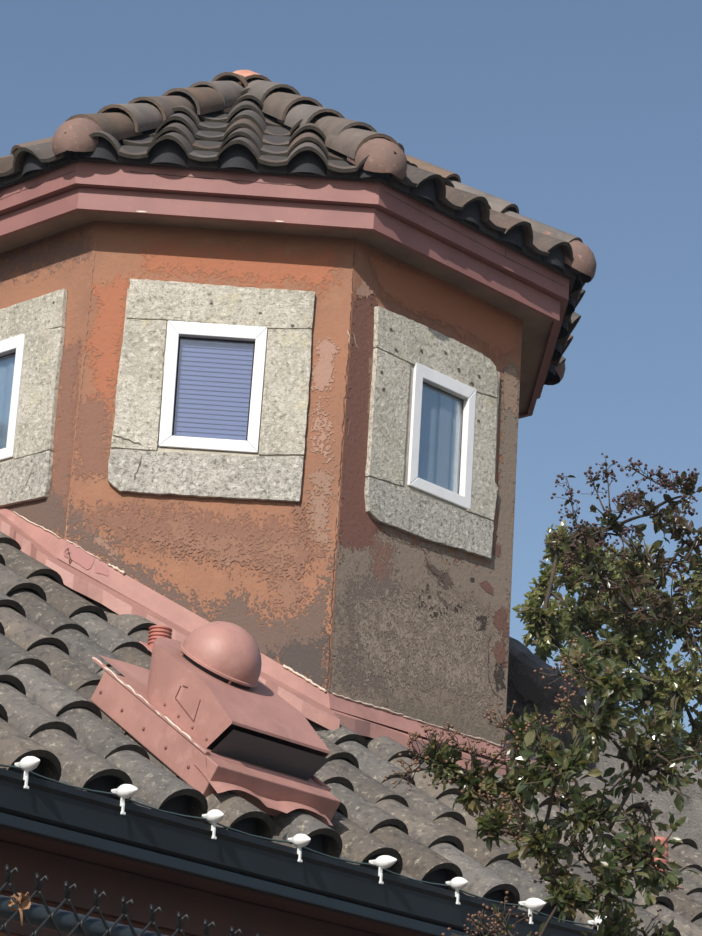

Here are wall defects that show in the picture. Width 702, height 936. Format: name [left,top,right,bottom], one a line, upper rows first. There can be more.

crack [113,435,142,480]
damp [4,289,545,744]
peeling [64,337,520,748]